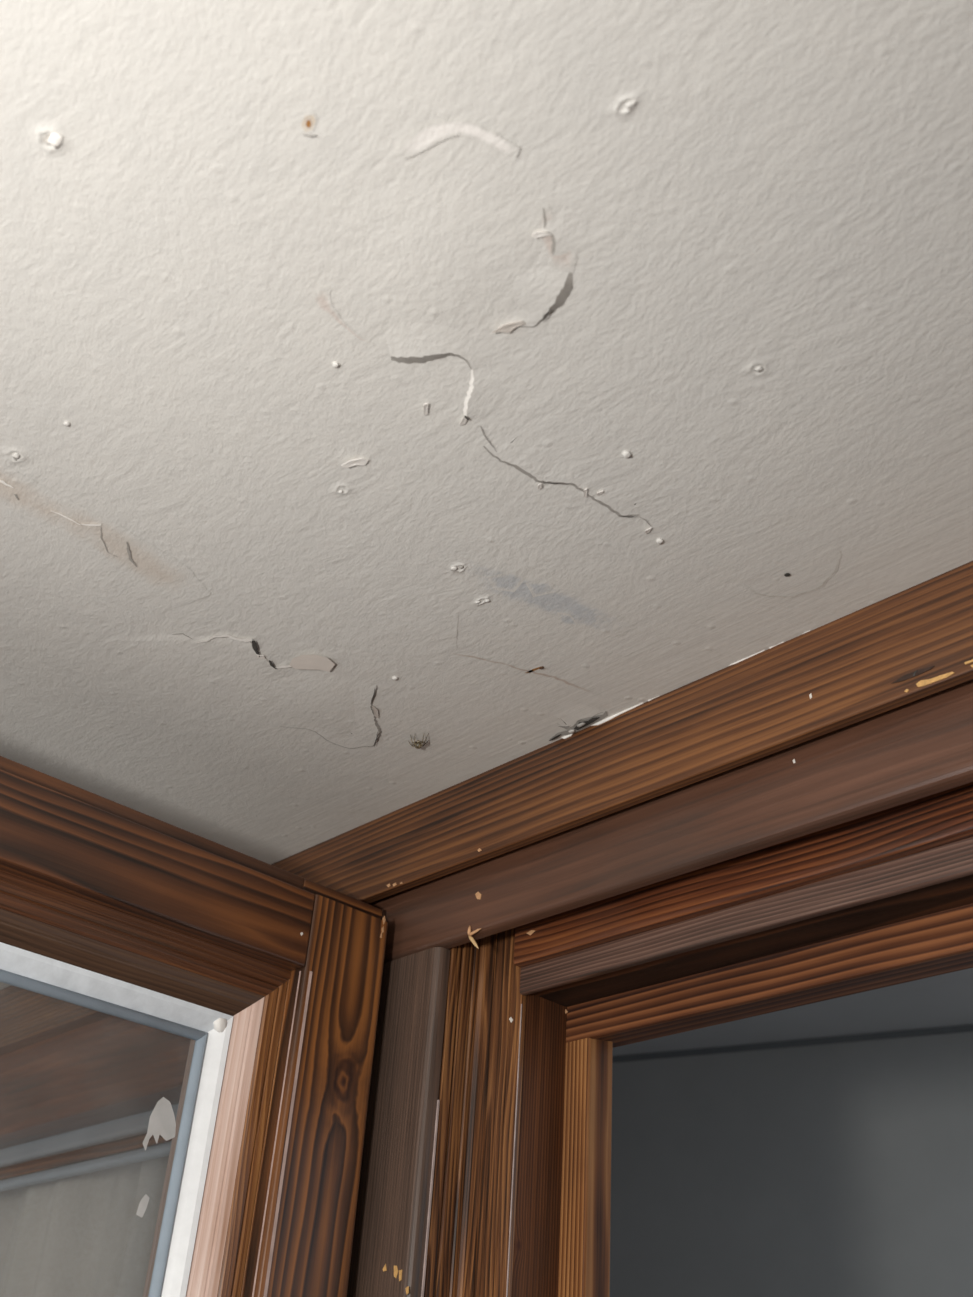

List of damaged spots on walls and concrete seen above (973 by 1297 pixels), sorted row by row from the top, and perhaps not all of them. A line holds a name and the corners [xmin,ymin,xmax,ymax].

peeling [386,266,573,425]
crack [0,463,295,682]